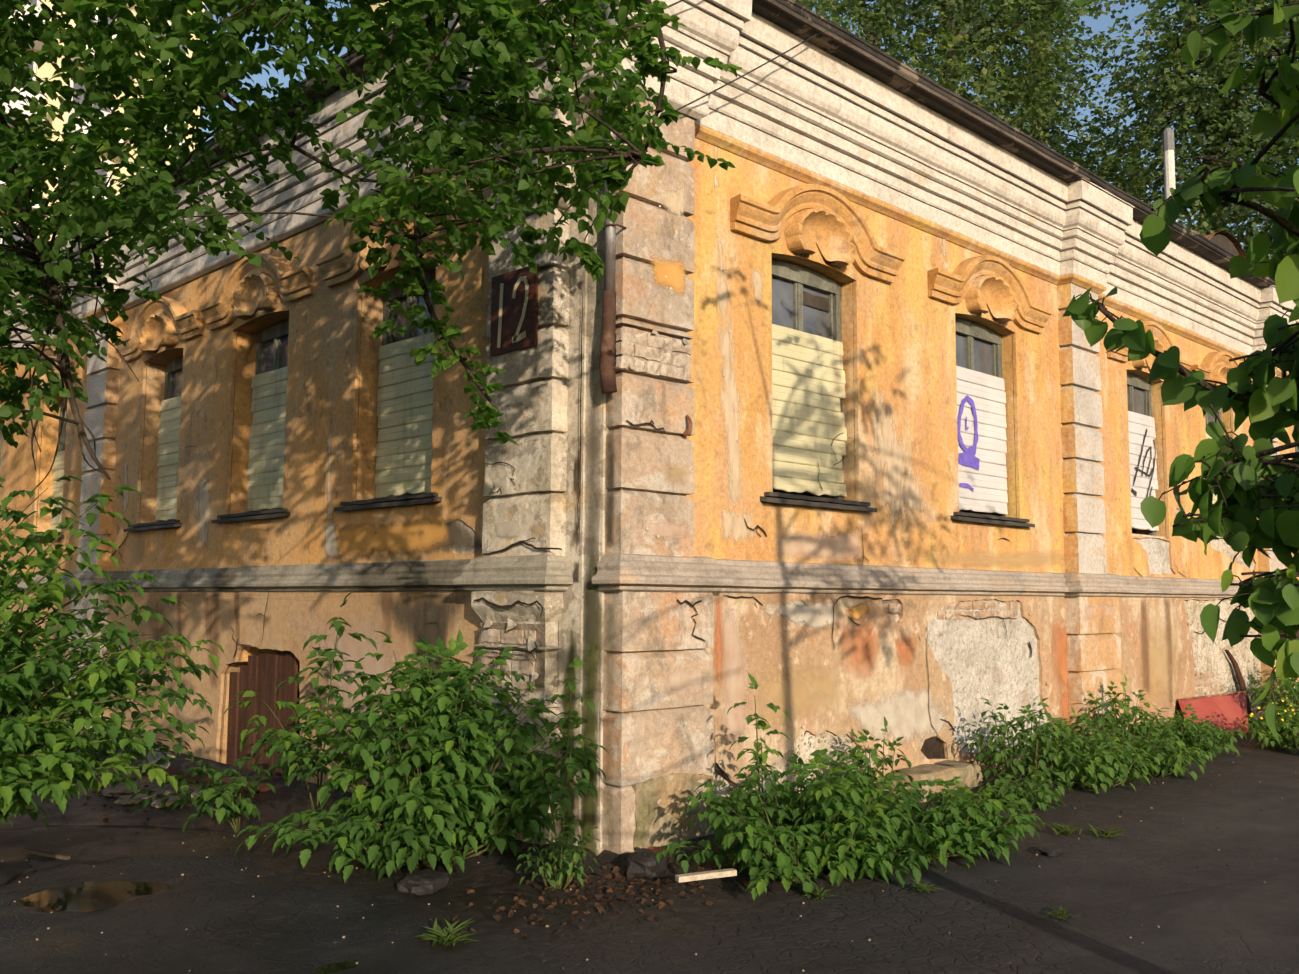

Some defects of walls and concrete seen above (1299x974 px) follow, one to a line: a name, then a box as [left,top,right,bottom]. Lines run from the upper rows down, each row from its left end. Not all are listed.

peeling [659,188,684,217]
peeling [654,261,684,293]
flaking render [615,326,692,381]
crack [483,293,583,555]
leakage [361,519,482,693]
crack [474,597,543,661]
crack [677,595,763,641]
peeling [755,600,833,633]
flaking render [849,599,901,623]
flaking render [919,599,1052,759]
flaking render [1183,599,1263,711]
flaking render [632,724,874,852]